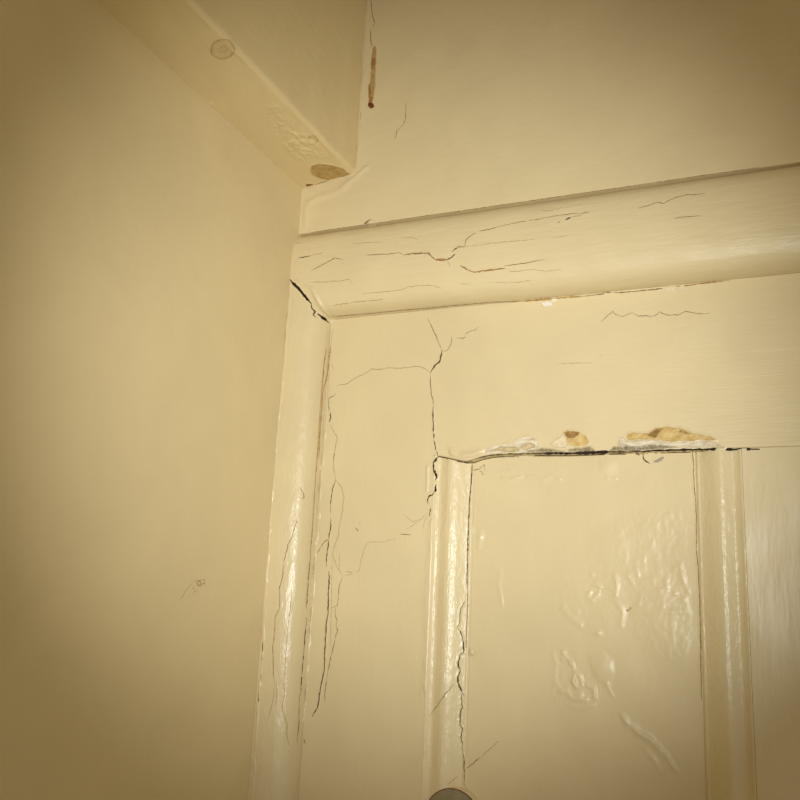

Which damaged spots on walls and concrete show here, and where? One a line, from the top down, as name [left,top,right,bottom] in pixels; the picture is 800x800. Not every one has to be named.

corrosion [368,47,376,108]
peeling [304,163,351,187]
peeling [484,429,593,458]
peeling [612,425,727,462]
crack [258,167,759,786]